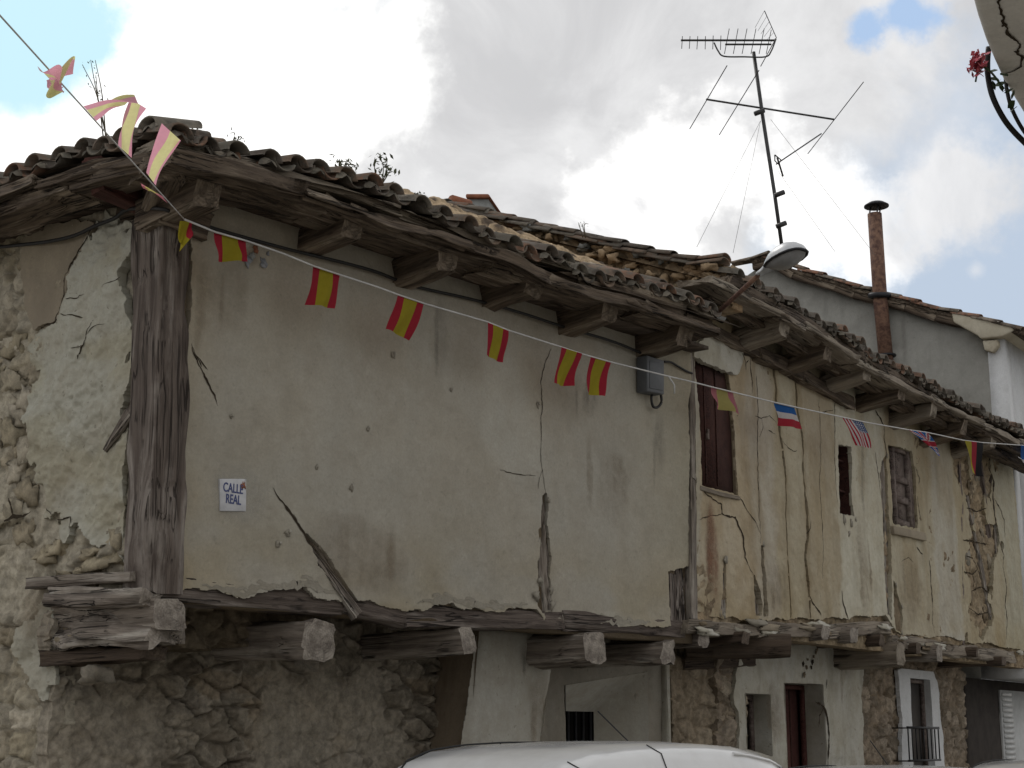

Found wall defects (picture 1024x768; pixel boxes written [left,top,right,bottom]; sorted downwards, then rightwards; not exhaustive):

crack [997,0,1024,74]
crack [41,222,120,359]
spalling [0,329,124,576]
spalling [103,402,130,453]
crack [192,347,217,402]
spalling [202,490,362,621]
crack [504,350,551,492]
crack [700,353,848,617]
spalling [957,457,997,623]